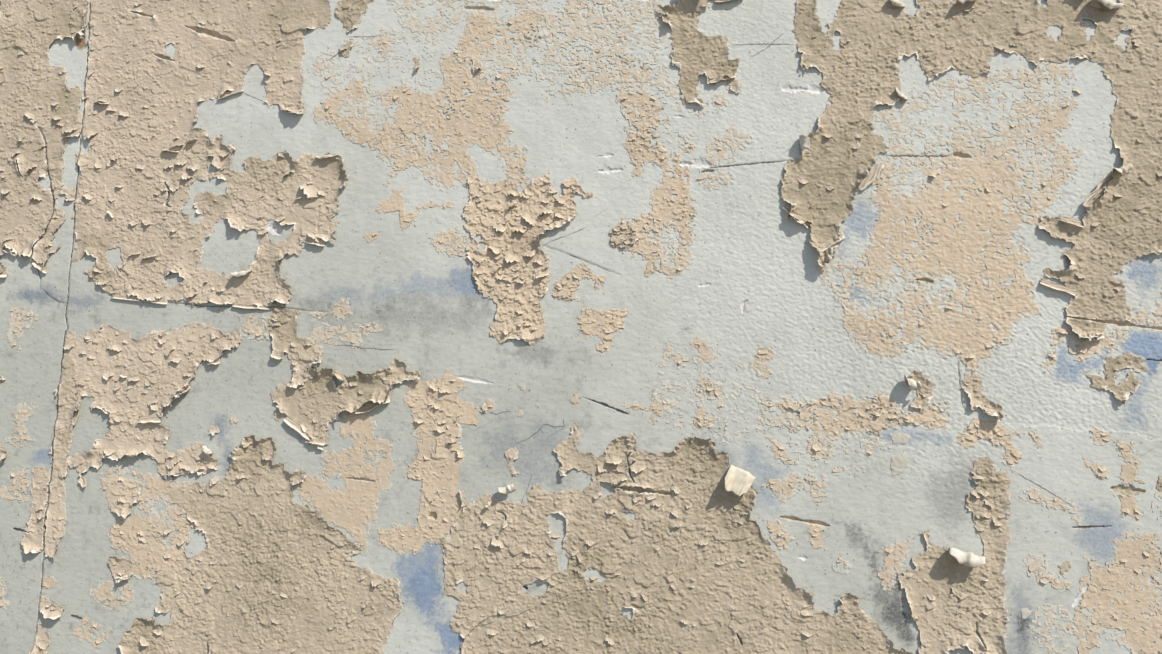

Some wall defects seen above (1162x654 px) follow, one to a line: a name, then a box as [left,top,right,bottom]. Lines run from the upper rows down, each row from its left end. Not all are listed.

crack [16,5,91,654]
peeling [0,0,912,654]
peeling [729,370,951,507]
peeling [781,0,1162,654]